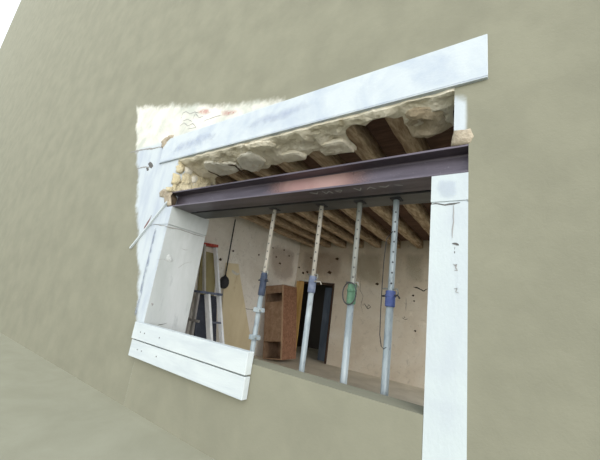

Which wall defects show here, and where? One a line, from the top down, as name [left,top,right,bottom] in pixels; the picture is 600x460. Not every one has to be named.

spalling [179,88,474,185]
crack [433,202,460,238]